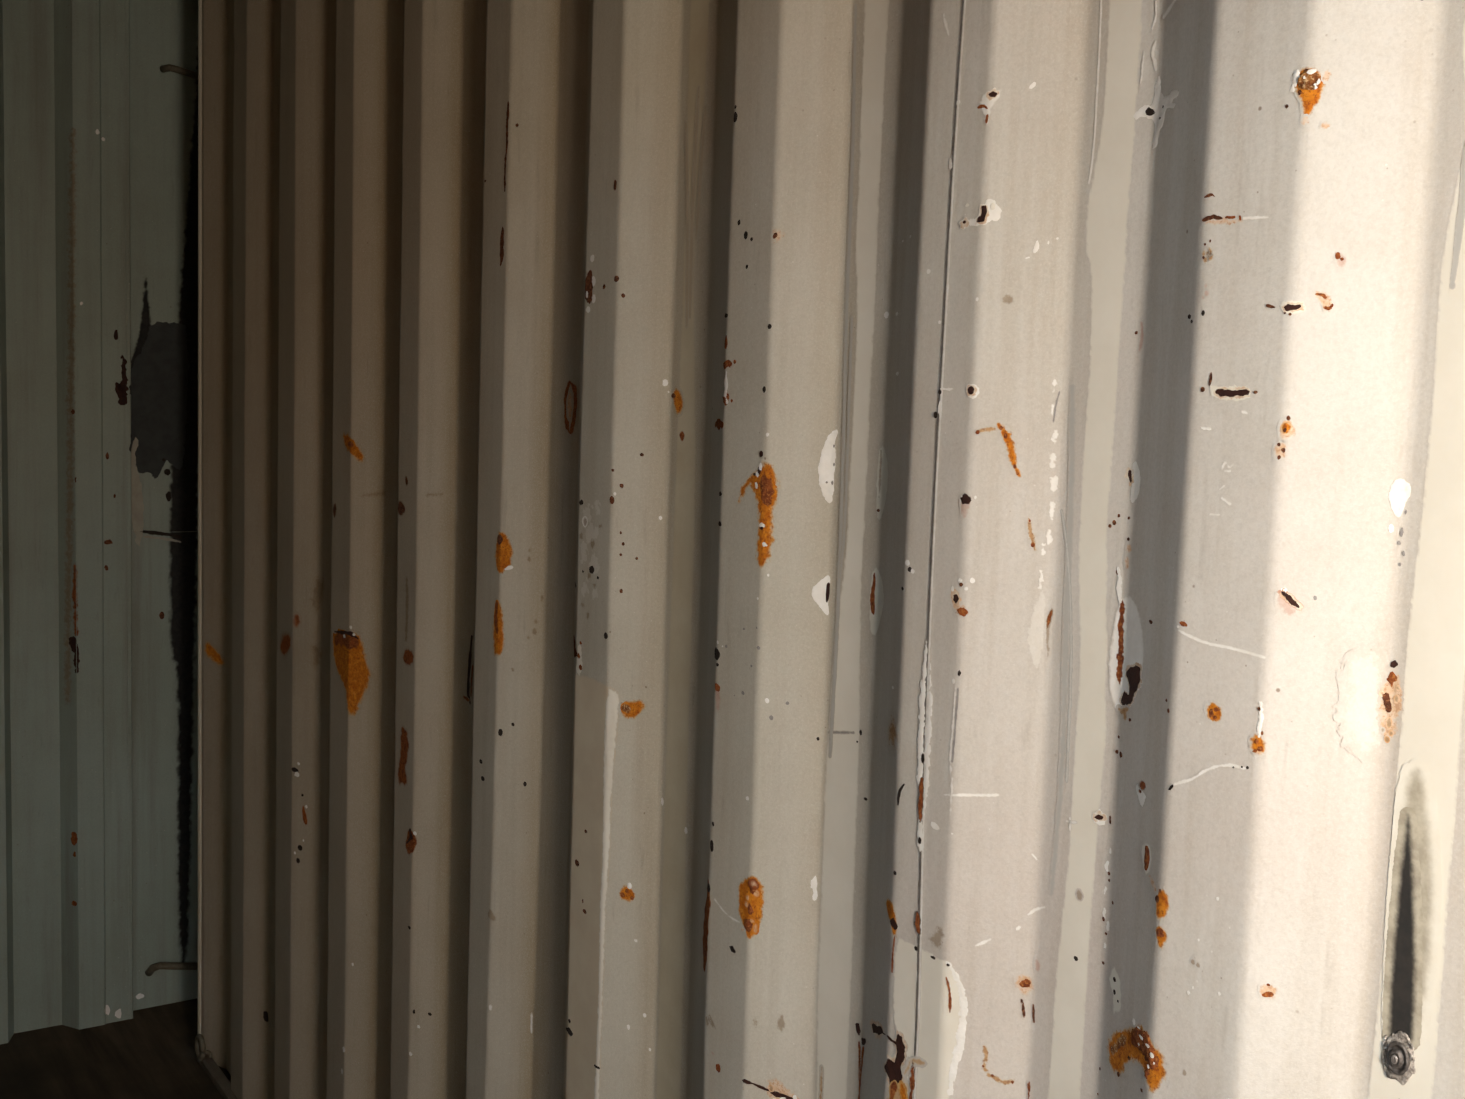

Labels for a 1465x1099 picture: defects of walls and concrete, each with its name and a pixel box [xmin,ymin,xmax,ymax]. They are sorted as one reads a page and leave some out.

corrosion [1285,63,1333,131]
peeling [818,430,838,503]
corrosion [974,421,1023,479]
corrosion [494,529,533,576]
corrosion [719,433,783,577]
corrosion [1025,516,1039,552]
corrosion [279,575,374,719]
peeling [1332,642,1404,763]
corrosion [736,873,767,943]
peeling [869,937,969,1099]
corrosion [980,1043,1031,1099]
corrosion [1099,1018,1188,1096]